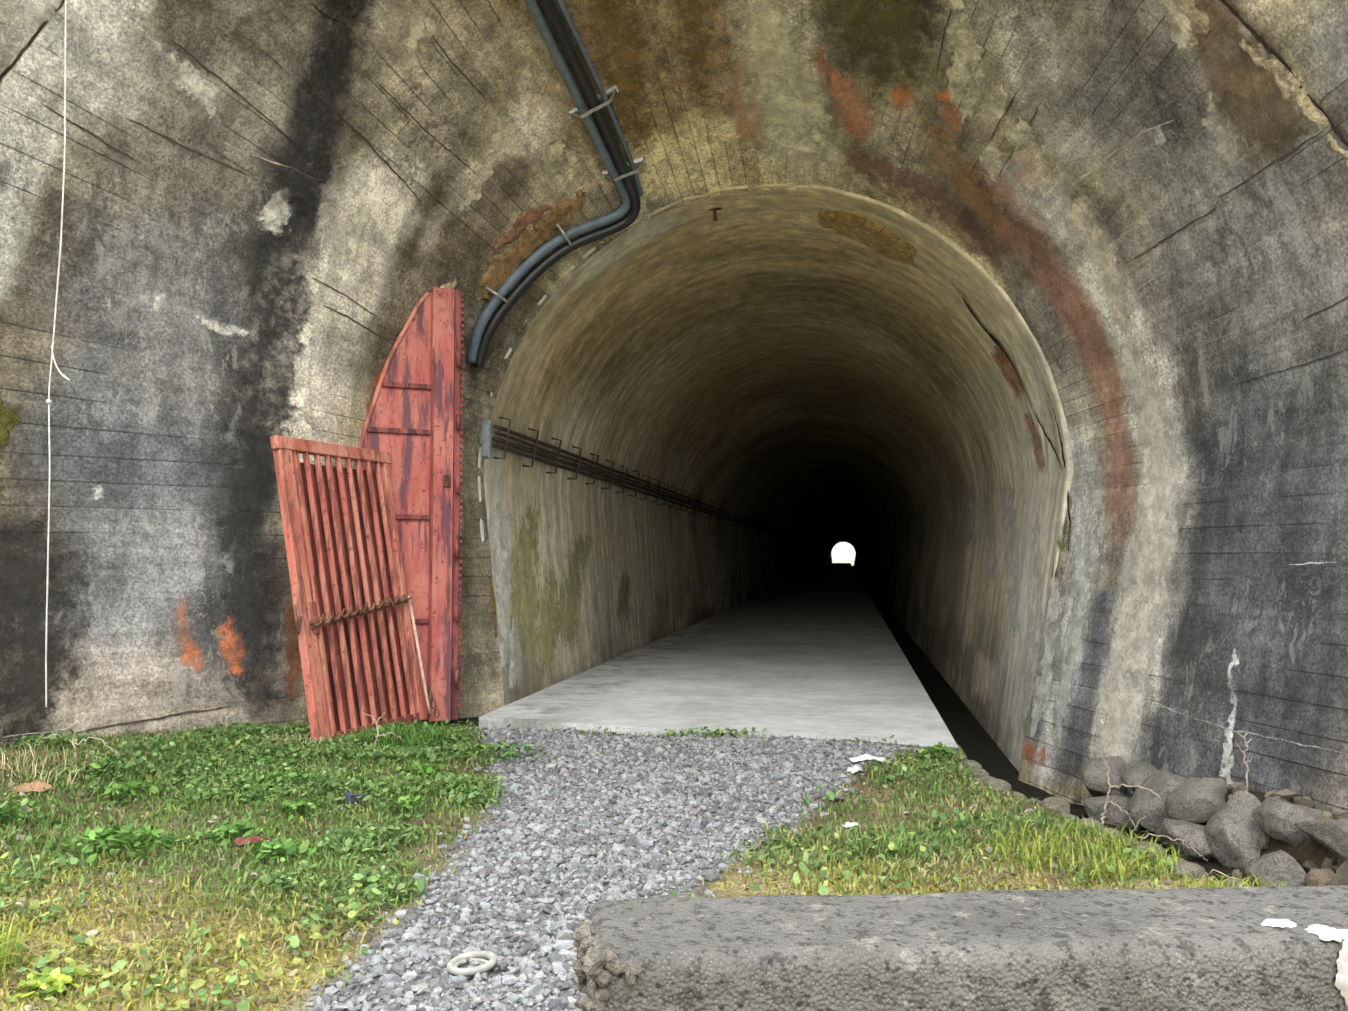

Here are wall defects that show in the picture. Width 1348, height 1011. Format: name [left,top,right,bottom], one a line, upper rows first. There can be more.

crack [0,0,65,82]
crack [42,104,250,176]
crack [171,40,297,145]
damp [591,0,656,154]
damp [728,0,836,166]
damp [827,0,943,95]
rust [816,46,1016,270]
crack [972,91,1039,194]
crack [1133,0,1348,260]
damp [216,0,371,717]
rust [990,346,1044,470]
rust [220,621,245,674]